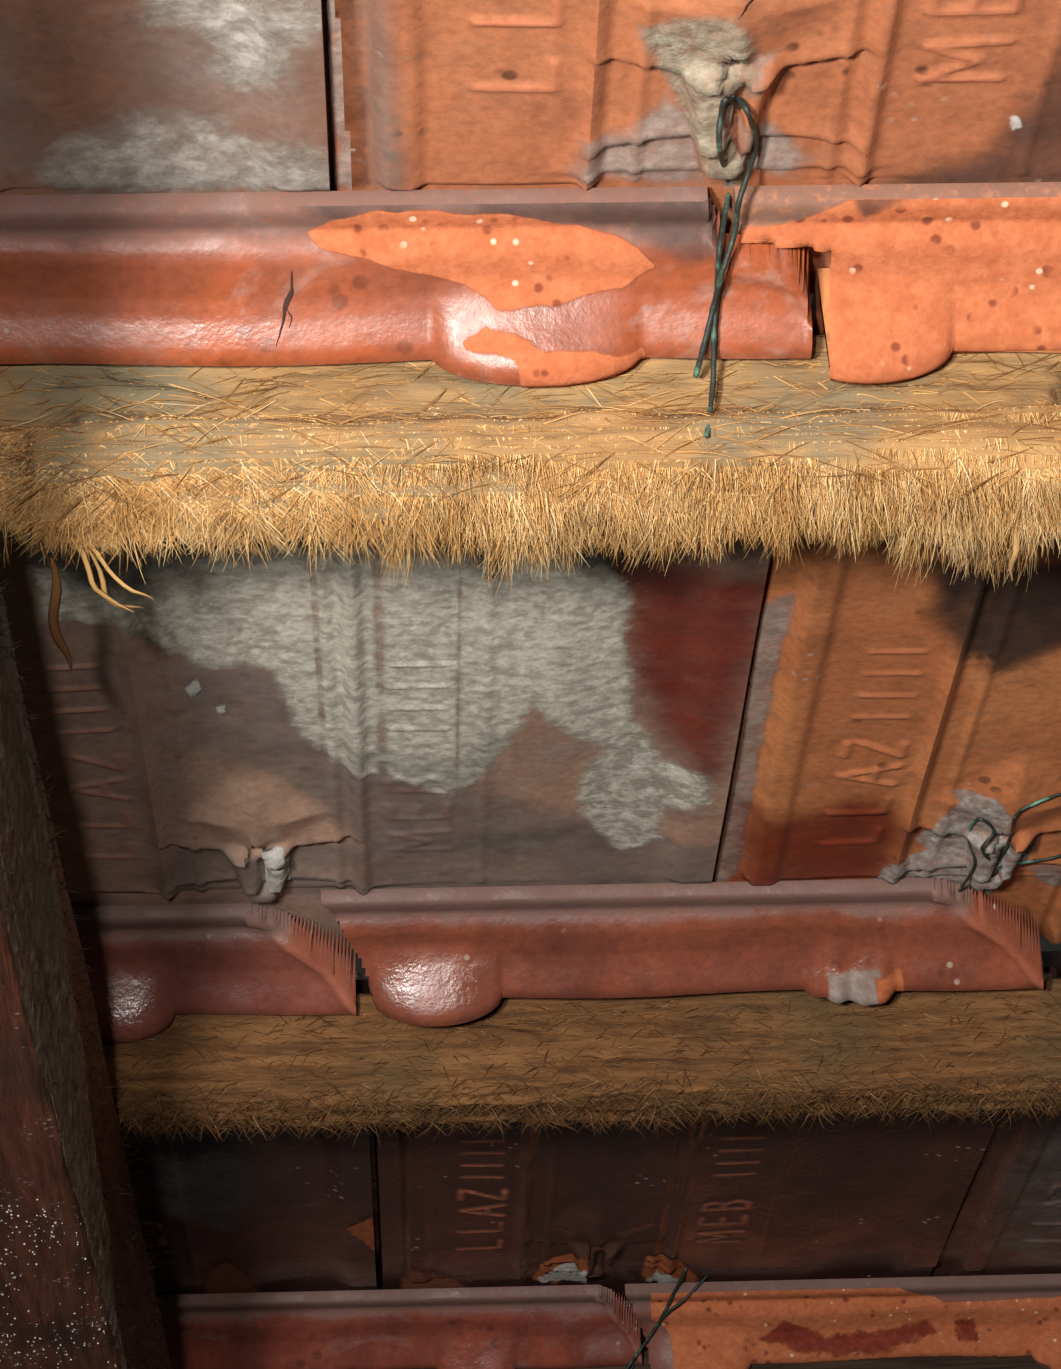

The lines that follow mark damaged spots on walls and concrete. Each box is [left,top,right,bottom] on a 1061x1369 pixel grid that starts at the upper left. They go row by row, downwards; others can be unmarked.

leakage [36,0,356,192]
spalling [307,210,655,311]
spalling [463,327,645,388]
spalling [740,197,1061,385]
leakage [25,530,1061,894]
leakage [0,658,127,1369]
spalling [641,1254,1061,1369]